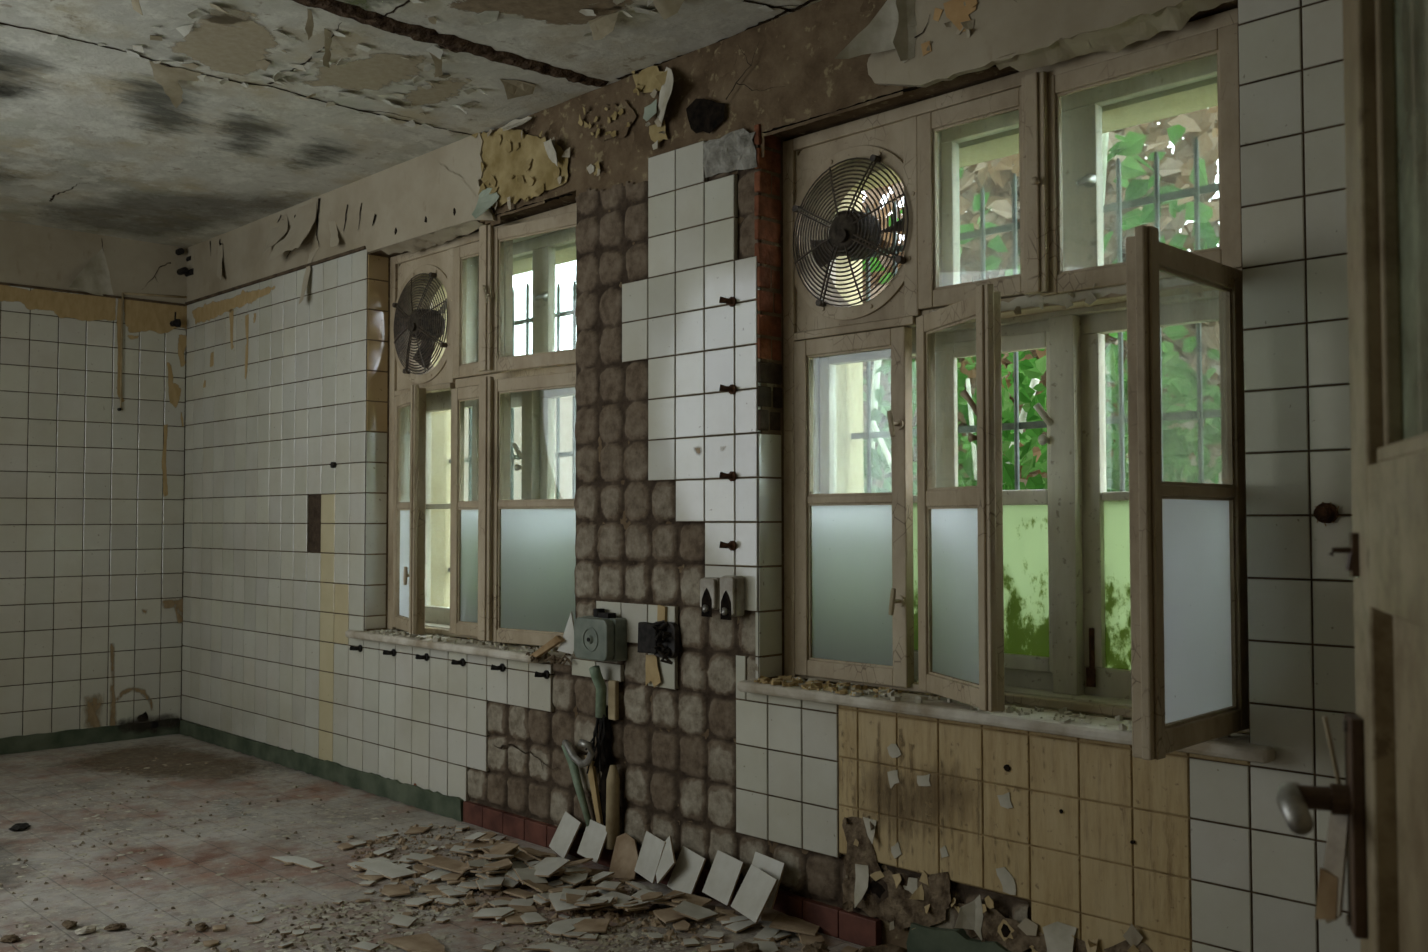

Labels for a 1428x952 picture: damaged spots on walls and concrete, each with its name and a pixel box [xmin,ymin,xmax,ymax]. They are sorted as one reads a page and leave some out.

mould [0,53,48,96]
peeling [131,0,488,115]
peeling [995,0,1235,72]
mould [127,81,193,131]
water stain [223,116,275,150]
peeling [262,200,339,261]
peeling [1159,276,1194,295]
peeling [370,0,1153,952]
peeling [308,494,322,552]